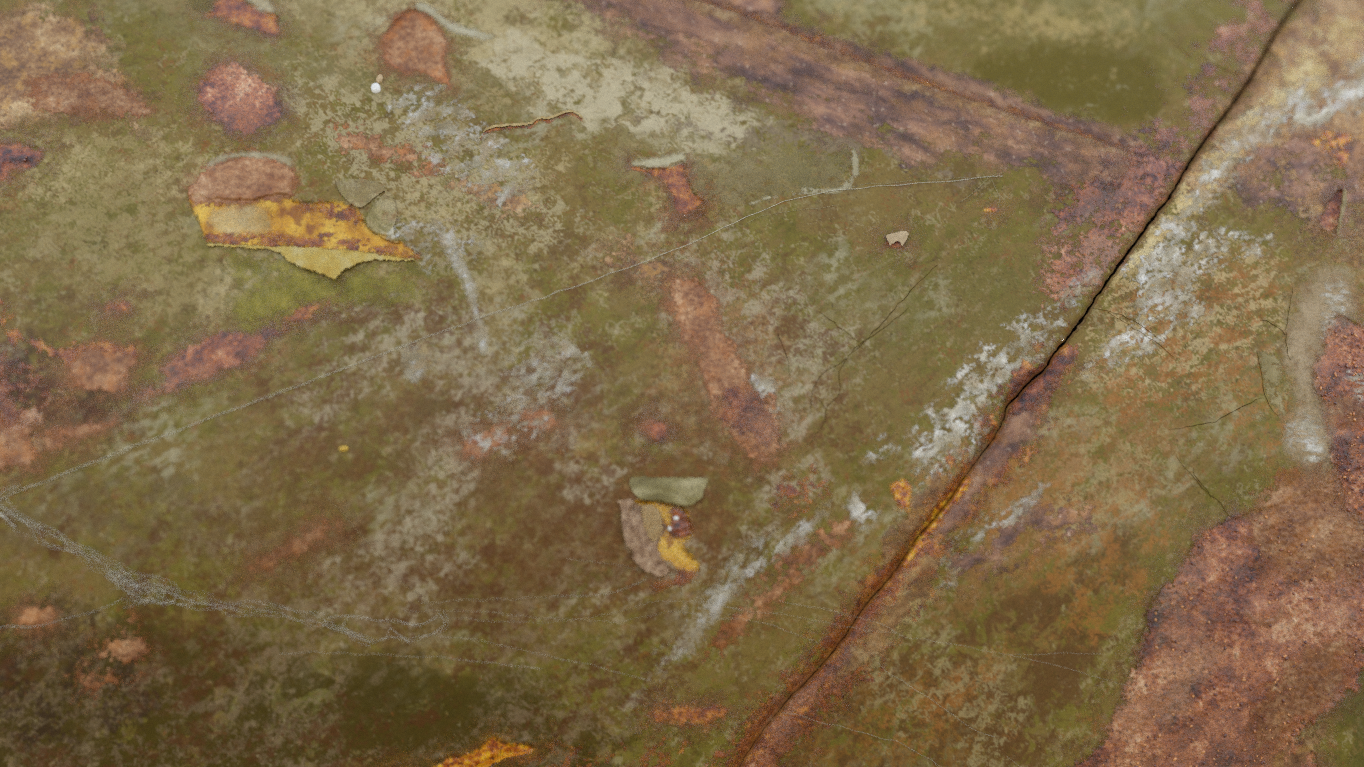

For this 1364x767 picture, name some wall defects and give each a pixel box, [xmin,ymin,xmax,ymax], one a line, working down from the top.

corrosion [0,1,153,185]
peeling [188,148,419,279]
peeling [375,3,493,90]
peeling [628,154,704,217]
corrosion [564,0,1364,310]
efflorescence [1083,52,1364,377]
efflorescence [866,274,1094,486]
crack [737,0,1303,767]
peeling [616,476,708,586]
corrosion [552,342,1098,767]
water stain [974,497,1031,541]
corrosion [1073,311,1364,767]